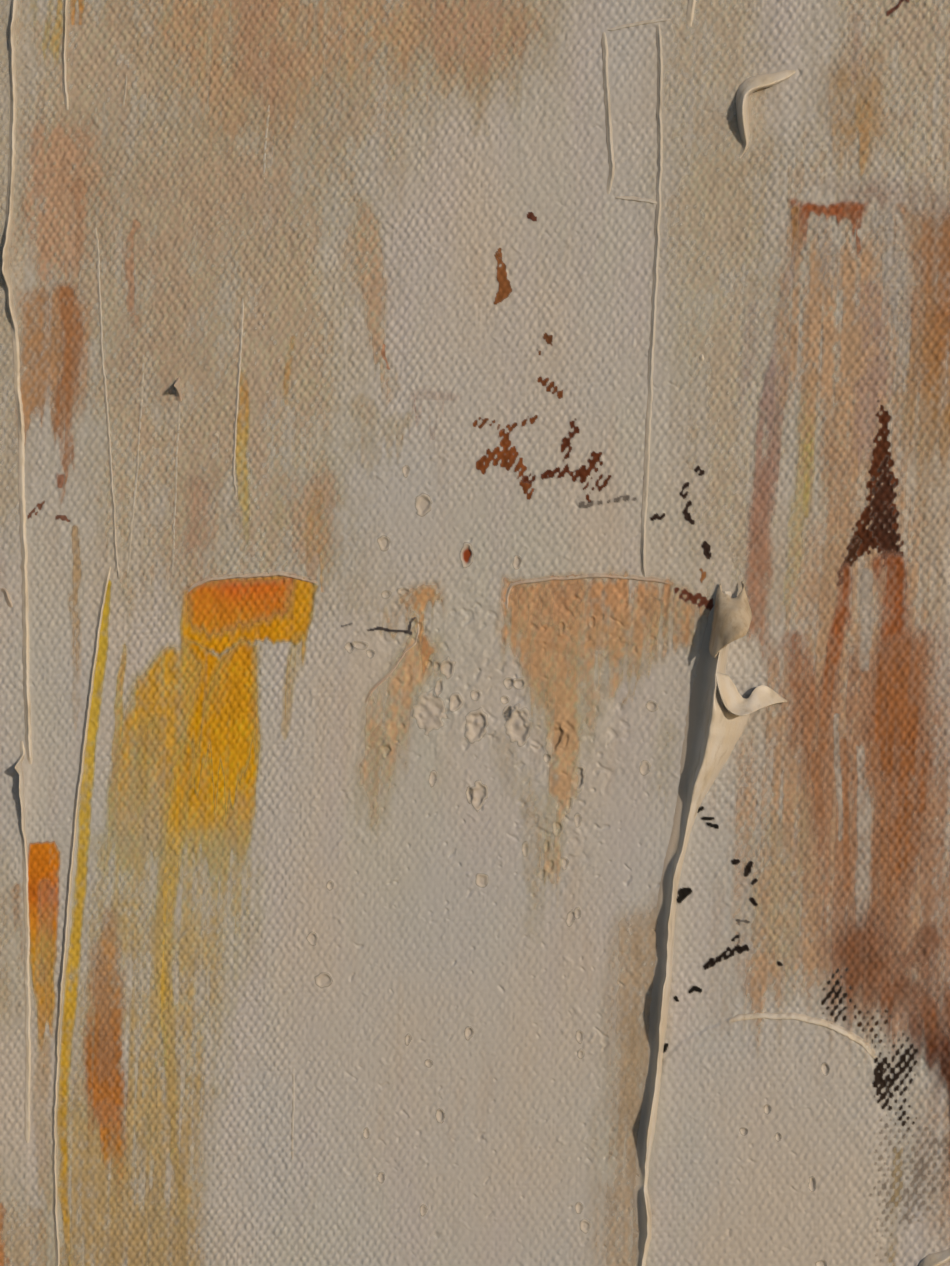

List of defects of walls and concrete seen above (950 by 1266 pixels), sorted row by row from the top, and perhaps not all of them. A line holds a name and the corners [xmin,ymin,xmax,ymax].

peeling [736,70,796,158]
rust [791,200,865,265]
rust [906,215,950,459]
rust [789,400,950,1101]